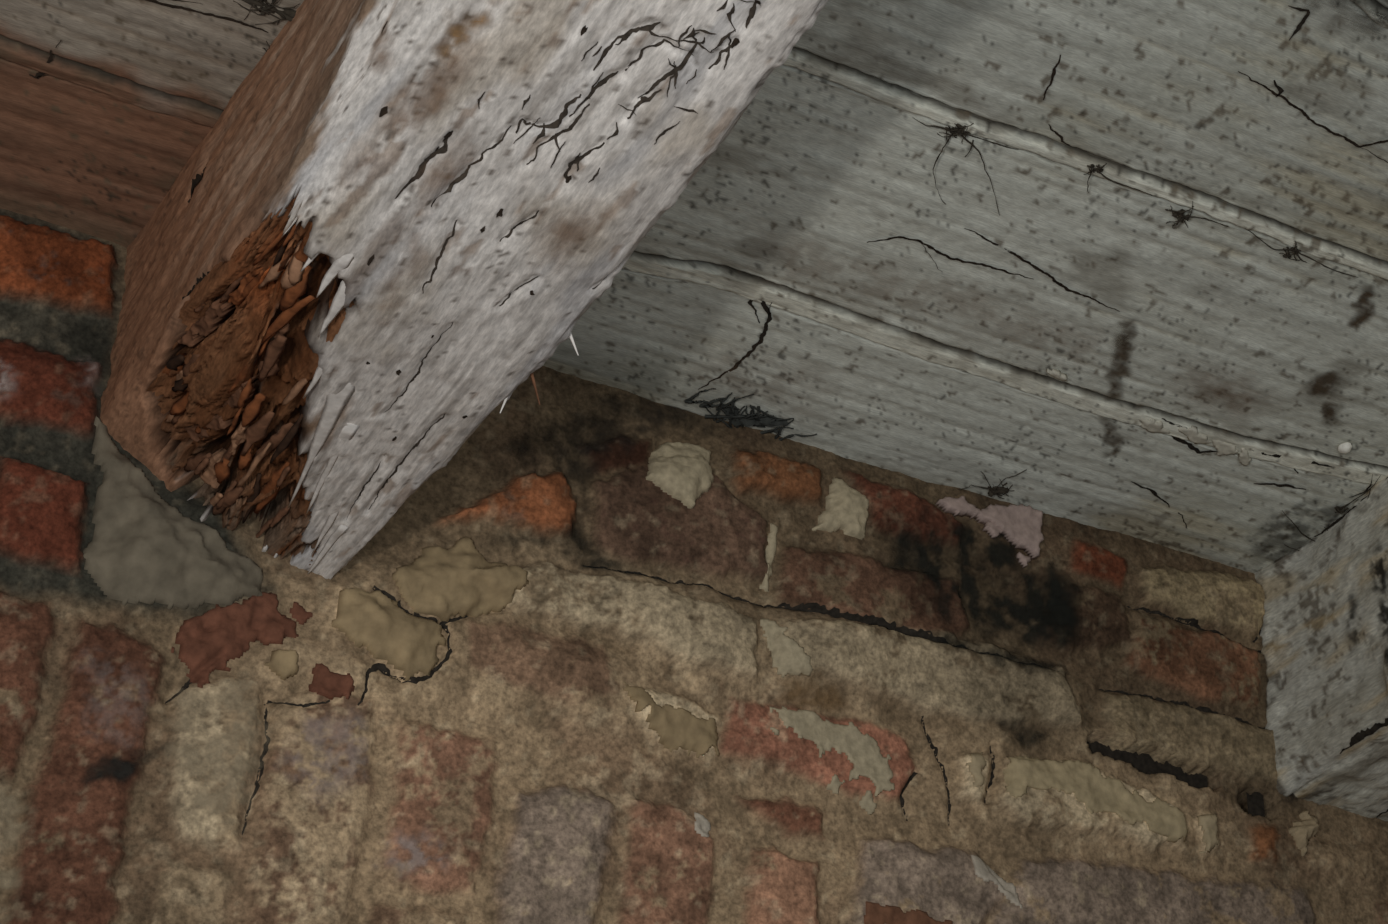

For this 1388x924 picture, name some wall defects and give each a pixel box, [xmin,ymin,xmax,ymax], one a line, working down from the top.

crack [395,0,761,294]
crack [499,276,538,306]
crack [385,323,453,412]
crack [698,300,772,390]
crack [346,414,445,520]
peeling [935,496,1044,568]
crack [165,679,192,704]
crack [242,585,468,835]
peeling [760,618,813,678]
crack [583,565,1059,672]
peeling [769,706,895,815]
water stain [897,525,1079,669]